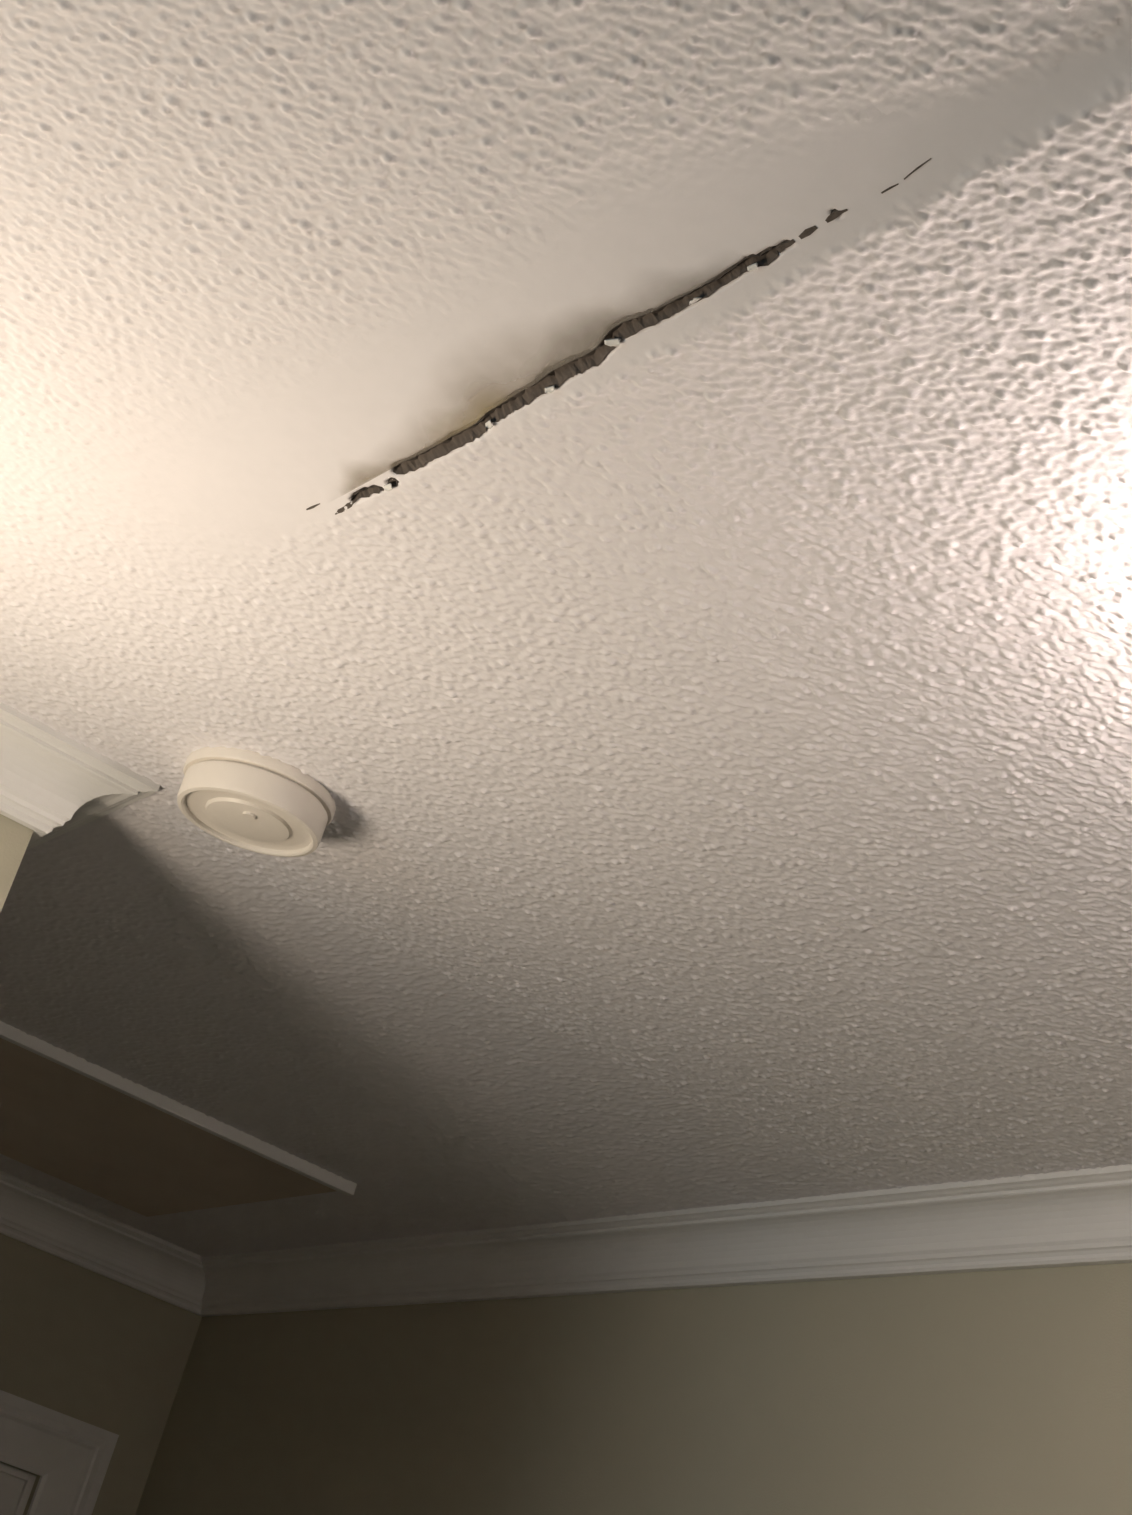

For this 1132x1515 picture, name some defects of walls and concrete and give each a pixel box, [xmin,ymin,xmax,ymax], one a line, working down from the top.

crack [881,158,931,194]
crack [306,209,848,515]